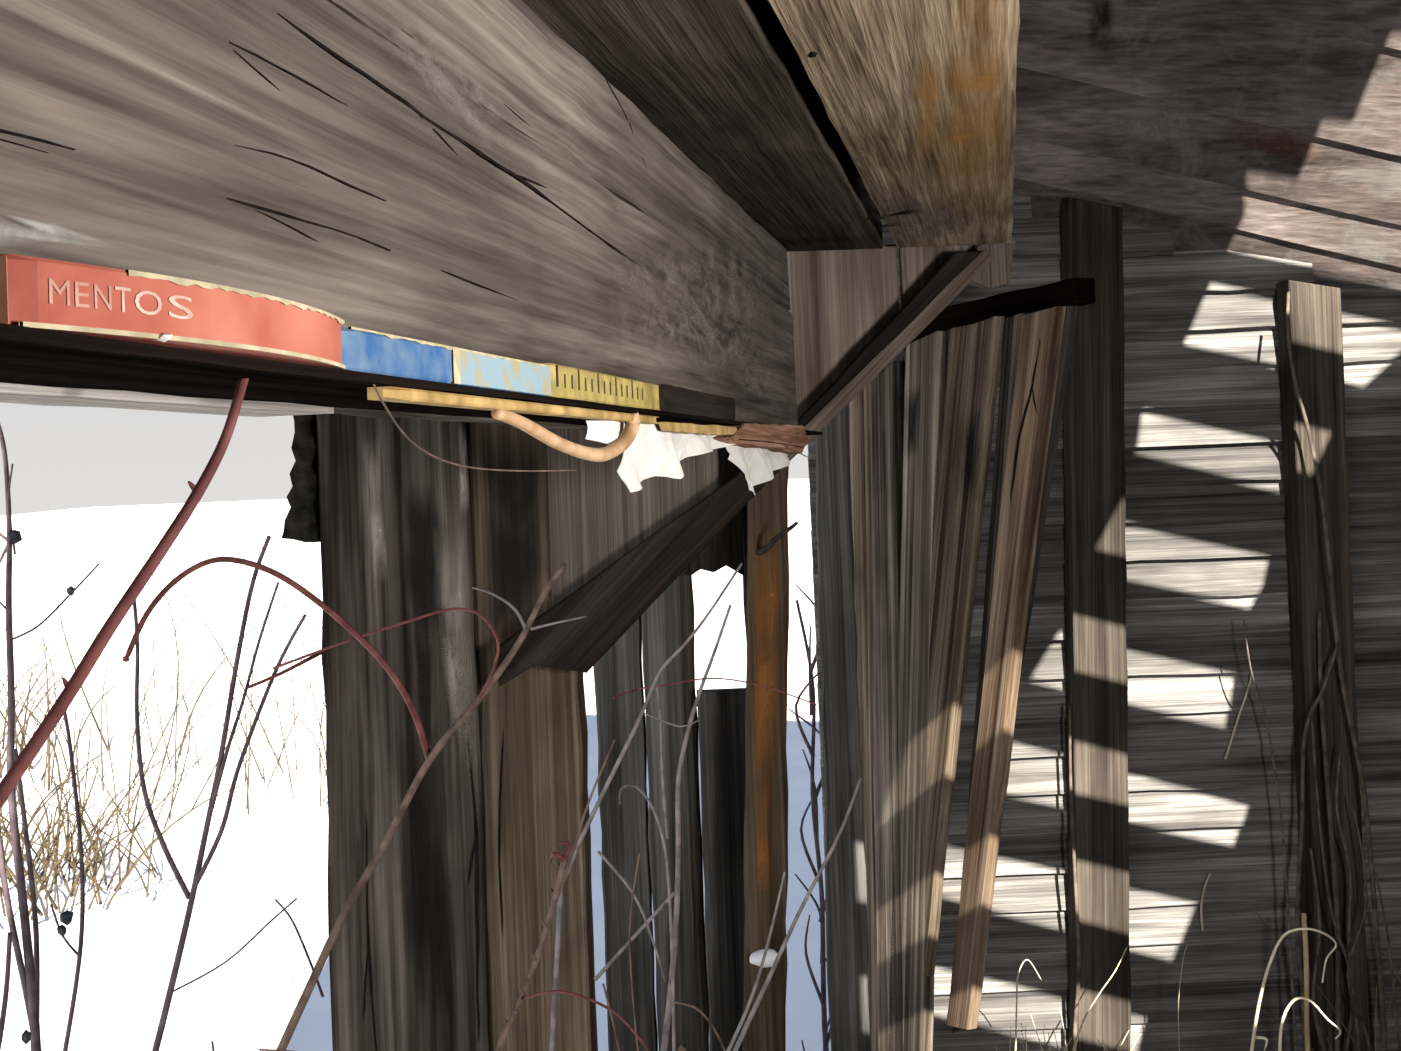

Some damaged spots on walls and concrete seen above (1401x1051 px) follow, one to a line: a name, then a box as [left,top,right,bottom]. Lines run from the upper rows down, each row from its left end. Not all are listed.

corrosion [756,659,774,755]